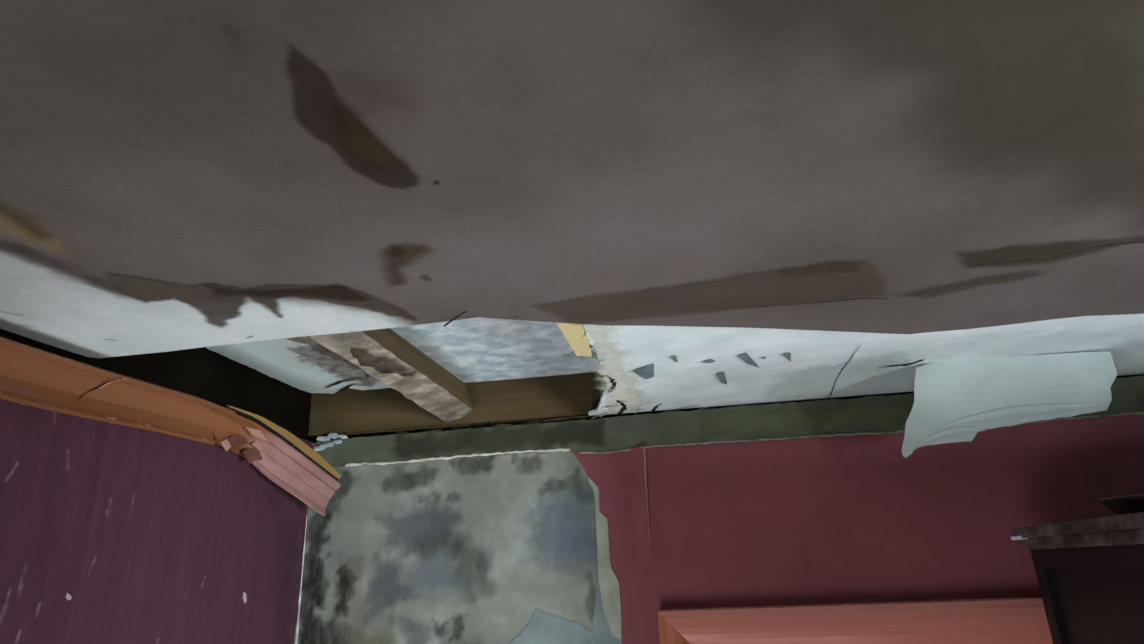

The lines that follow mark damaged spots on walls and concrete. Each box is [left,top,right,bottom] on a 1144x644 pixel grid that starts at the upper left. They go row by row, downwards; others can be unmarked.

damp [288,52,417,189]
damp [0,204,416,327]
damp [538,263,883,324]
damp [967,238,1144,267]
peeling [220,427,269,464]
damp [396,420,604,458]
damp [702,401,914,439]
peeling [298,331,1144,644]